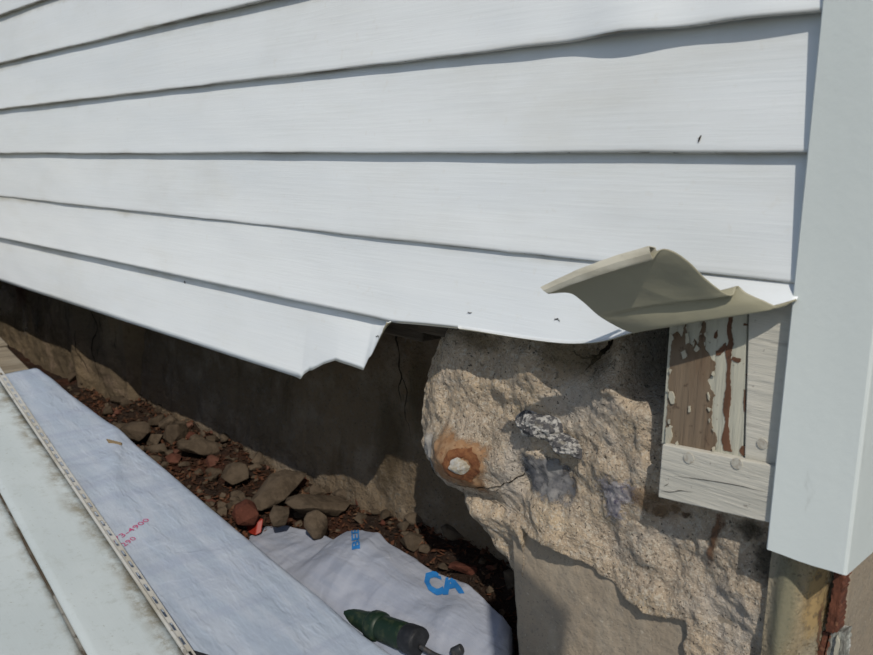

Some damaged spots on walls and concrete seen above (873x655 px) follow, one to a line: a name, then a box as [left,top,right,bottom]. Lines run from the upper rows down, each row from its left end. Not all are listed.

peeling [665,317,748,456]
rust [433,428,488,492]
crack [455,468,526,489]
rust [805,567,852,655]